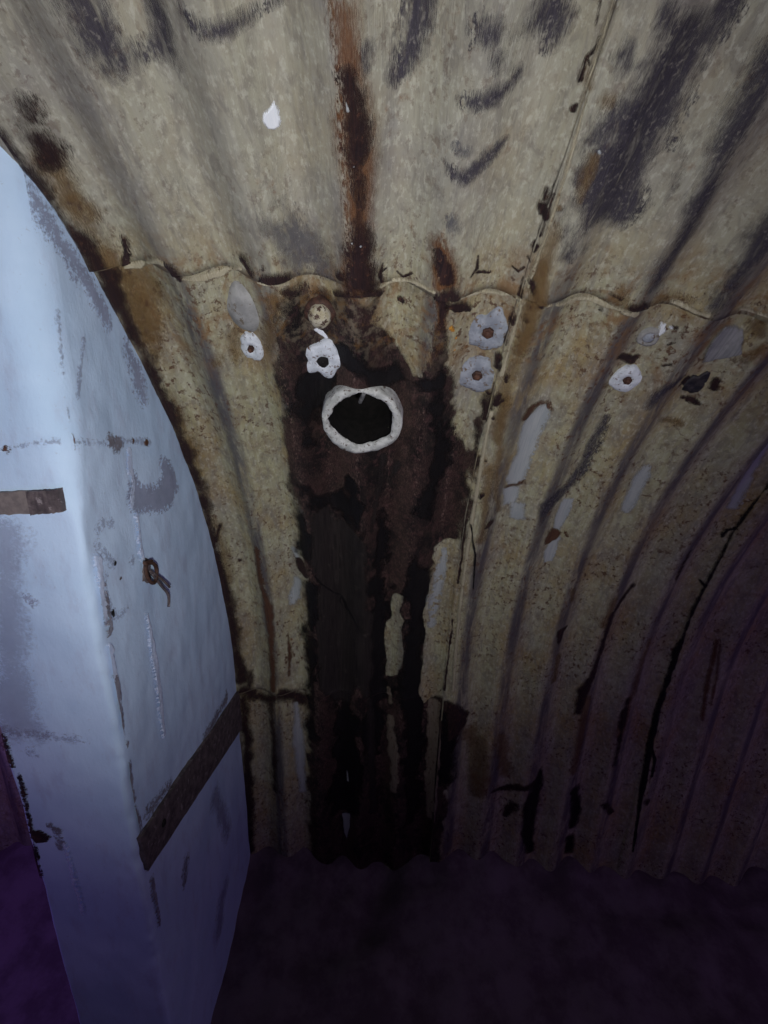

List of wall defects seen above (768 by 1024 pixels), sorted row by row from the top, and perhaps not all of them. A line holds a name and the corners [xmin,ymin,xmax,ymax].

leakage [27,183,112,329]
rust [0,0,600,871]
peeling [418,0,640,822]
crack [632,484,768,853]